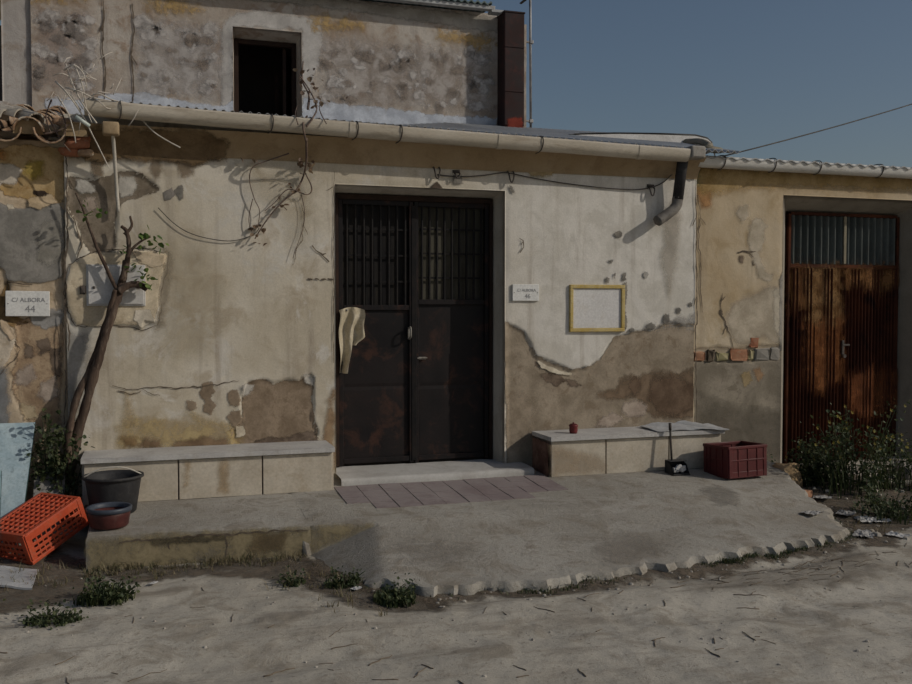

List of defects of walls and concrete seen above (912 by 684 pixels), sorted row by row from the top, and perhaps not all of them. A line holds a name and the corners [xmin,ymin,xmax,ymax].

spalling [0,117,184,254]
spalling [0,283,64,428]
crack [112,381,238,396]
spalling [186,381,216,415]
spalling [227,374,319,444]
spalling [505,260,783,477]
crack [692,179,733,422]
rust [789,267,900,417]